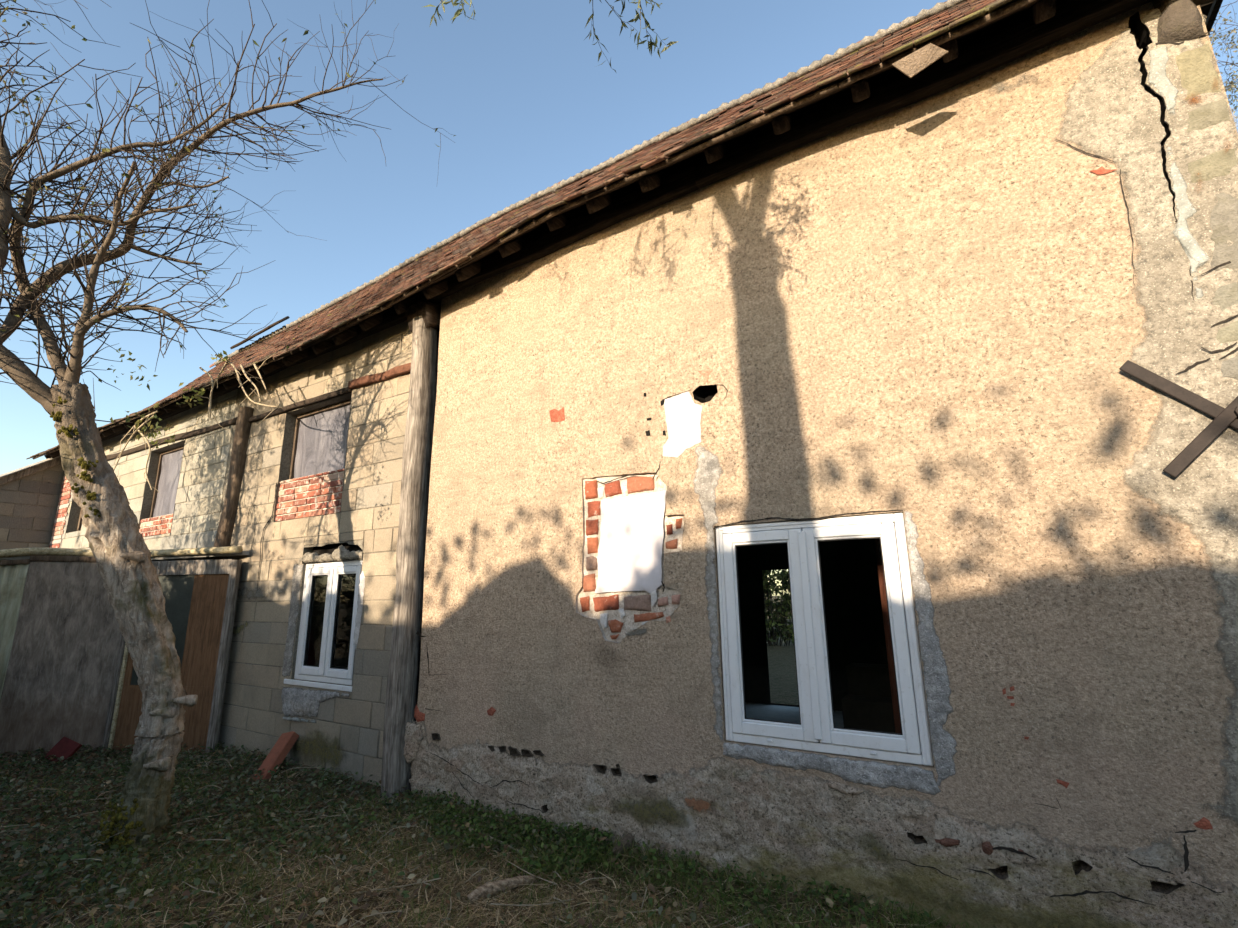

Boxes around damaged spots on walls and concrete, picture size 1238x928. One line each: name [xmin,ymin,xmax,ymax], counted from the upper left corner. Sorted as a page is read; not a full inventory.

spalling [1090,166,1117,175]
crack [1128,11,1213,223]
spalling [575,369,728,643]
spalling [404,704,1238,928]